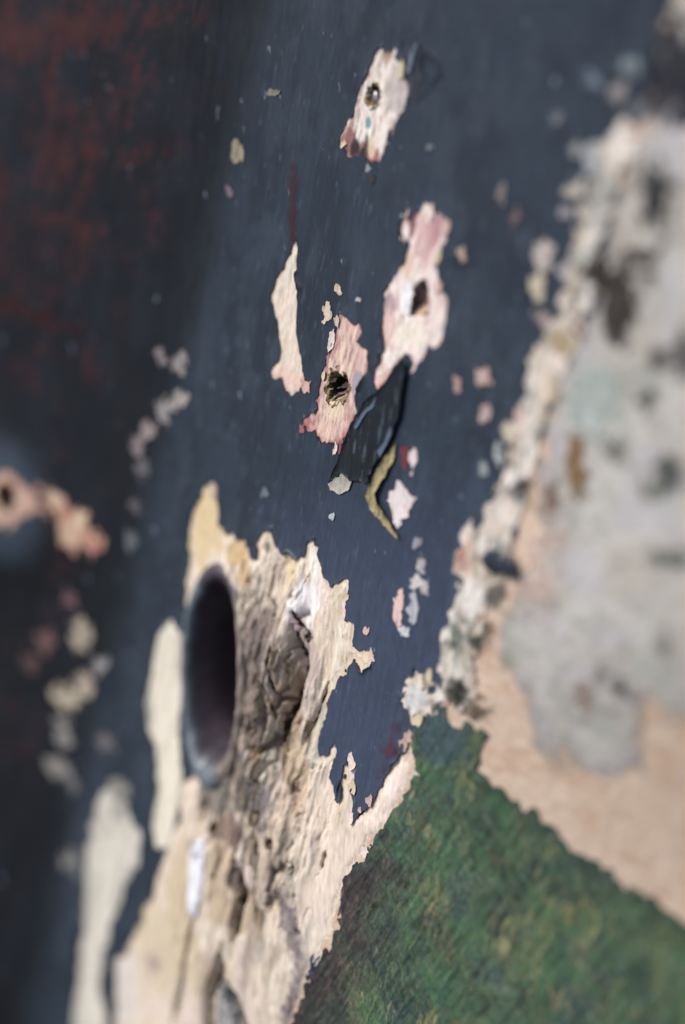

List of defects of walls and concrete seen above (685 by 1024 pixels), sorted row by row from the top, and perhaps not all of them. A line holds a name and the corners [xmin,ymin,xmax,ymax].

spalling [59,99,655,1024]
peeling [340,38,443,172]